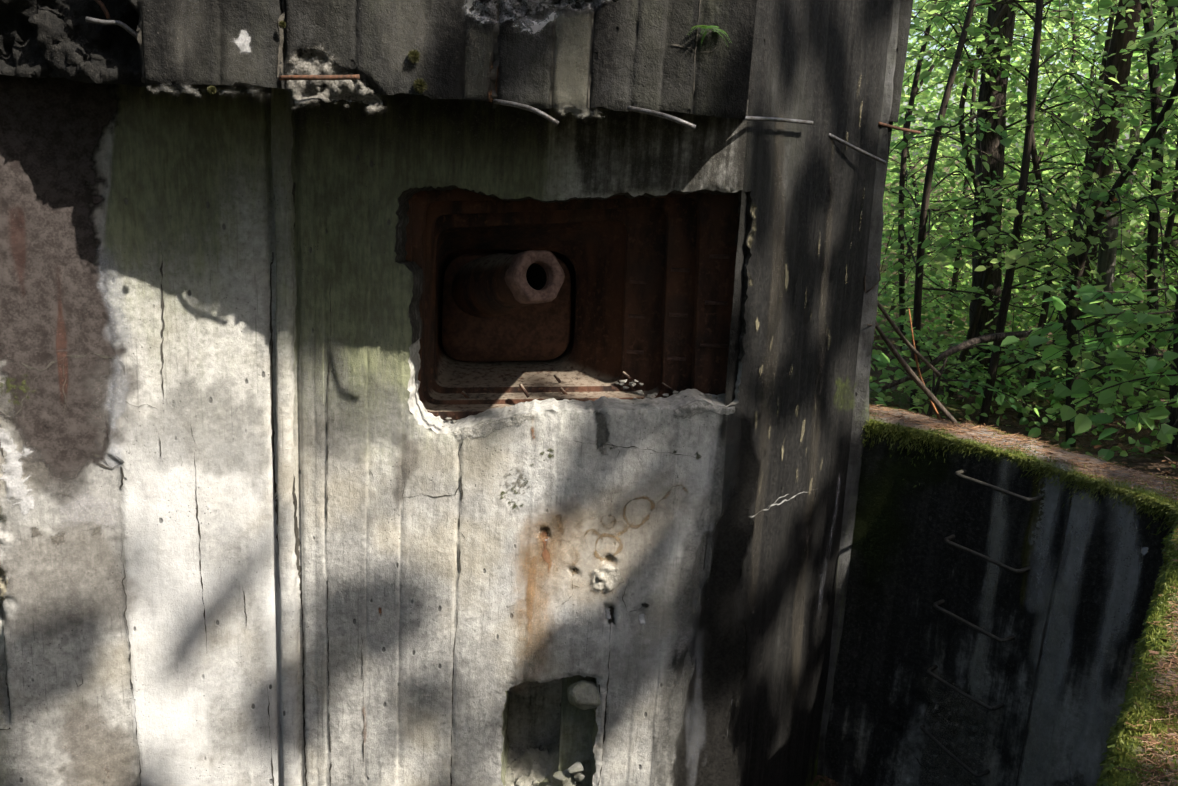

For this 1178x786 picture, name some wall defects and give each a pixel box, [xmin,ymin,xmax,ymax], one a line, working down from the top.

spalling [288,47,383,111]
spalling [465,0,610,32]
water stain [0,74,136,589]
crack [0,242,165,489]
peeling [0,567,8,600]
water stain [61,704,138,786]
crack [159,429,207,649]
crack [266,687,274,786]
crack [269,182,332,786]
corrosion [521,515,564,643]
water stain [1026,472,1094,785]
water stain [1070,500,1148,786]